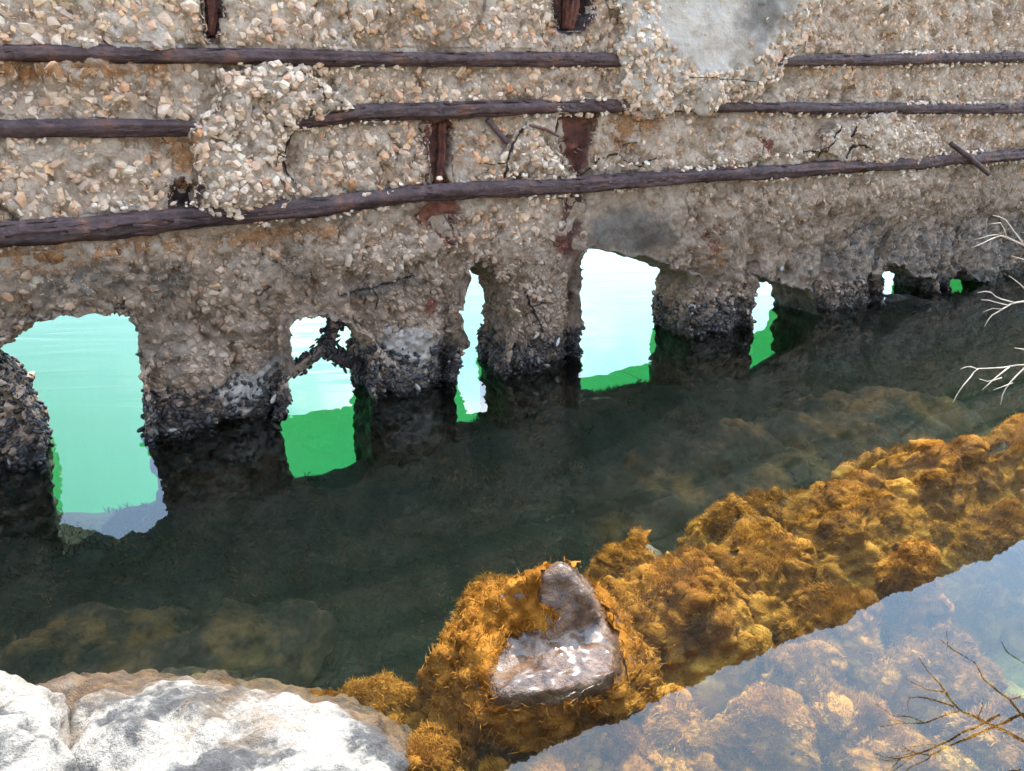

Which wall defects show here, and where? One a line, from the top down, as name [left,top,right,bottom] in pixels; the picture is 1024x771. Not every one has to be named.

rust [199,0,228,44]
rust [551,0,597,35]
rust [410,120,454,186]
crack [484,128,524,179]
rust [554,113,668,177]
crack [803,126,872,159]
rust [415,200,460,252]